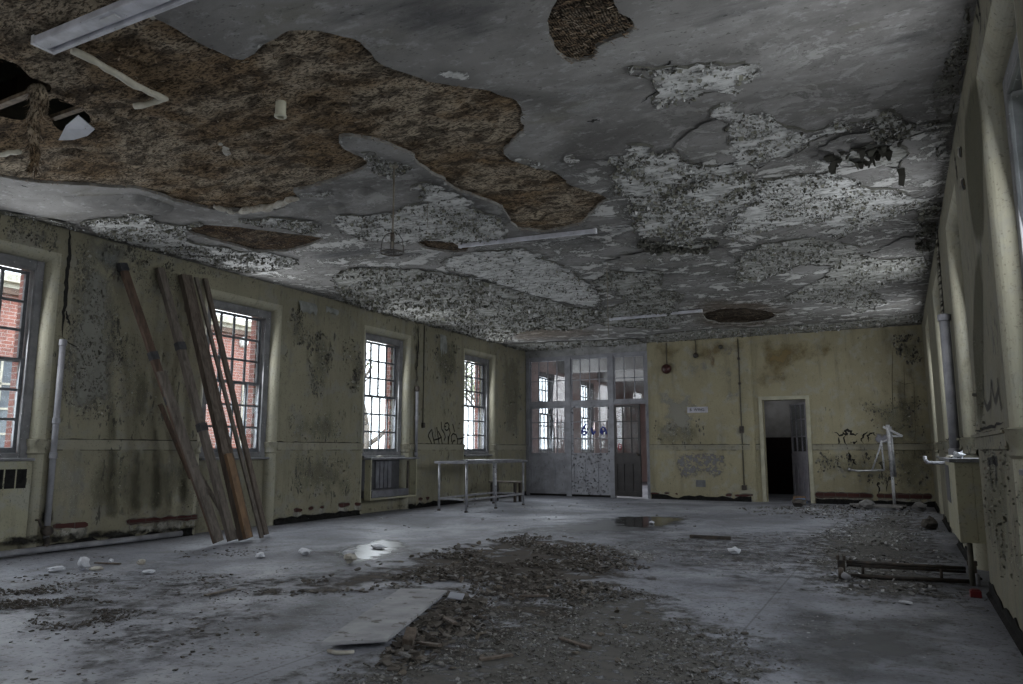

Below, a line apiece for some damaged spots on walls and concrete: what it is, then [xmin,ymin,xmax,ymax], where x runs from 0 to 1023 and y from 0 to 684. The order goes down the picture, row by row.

crack [61,230,77,347]
spalling [0,0,971,384]